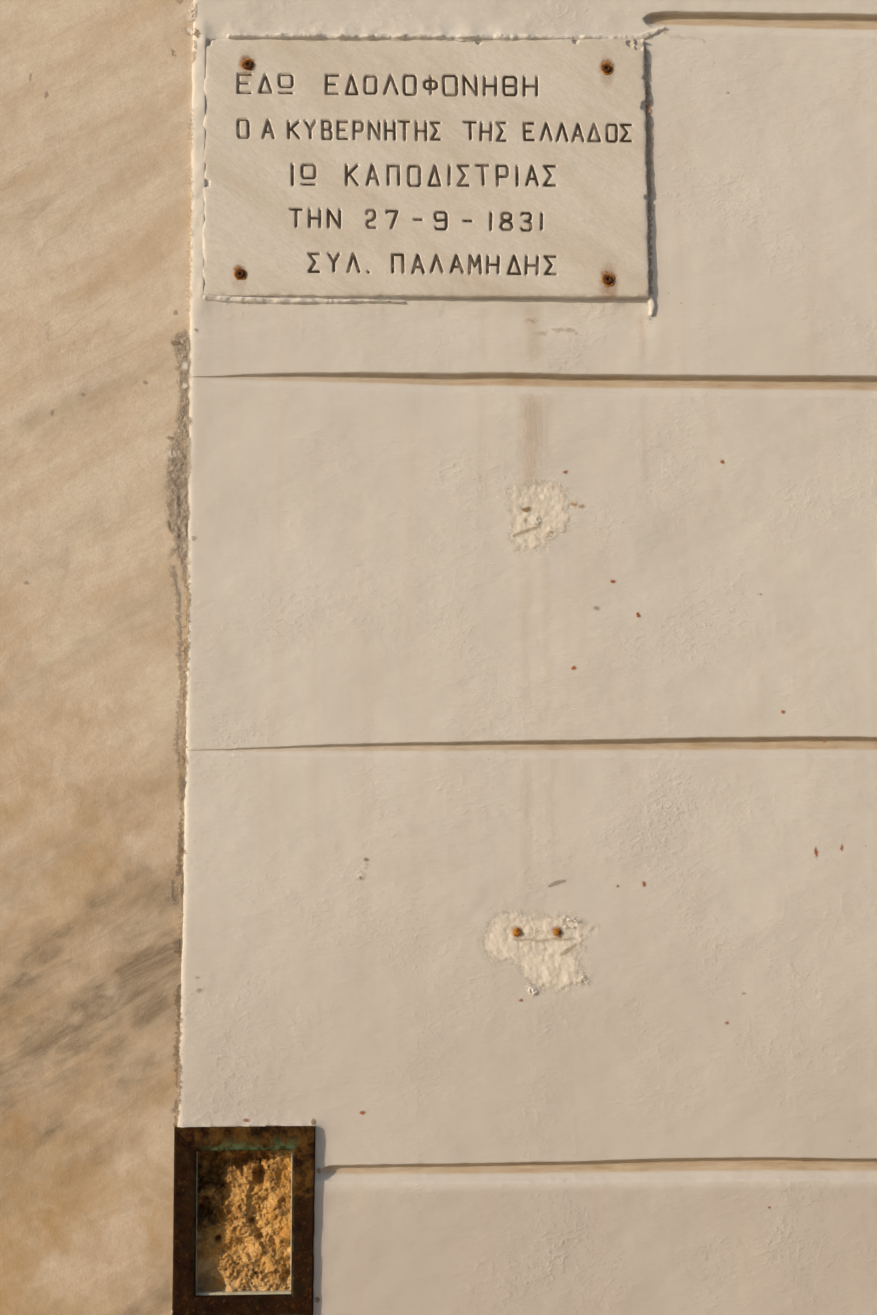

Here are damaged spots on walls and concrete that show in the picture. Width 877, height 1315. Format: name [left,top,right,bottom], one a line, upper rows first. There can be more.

spalling [508,481,583,551]
spalling [483,911,593,995]